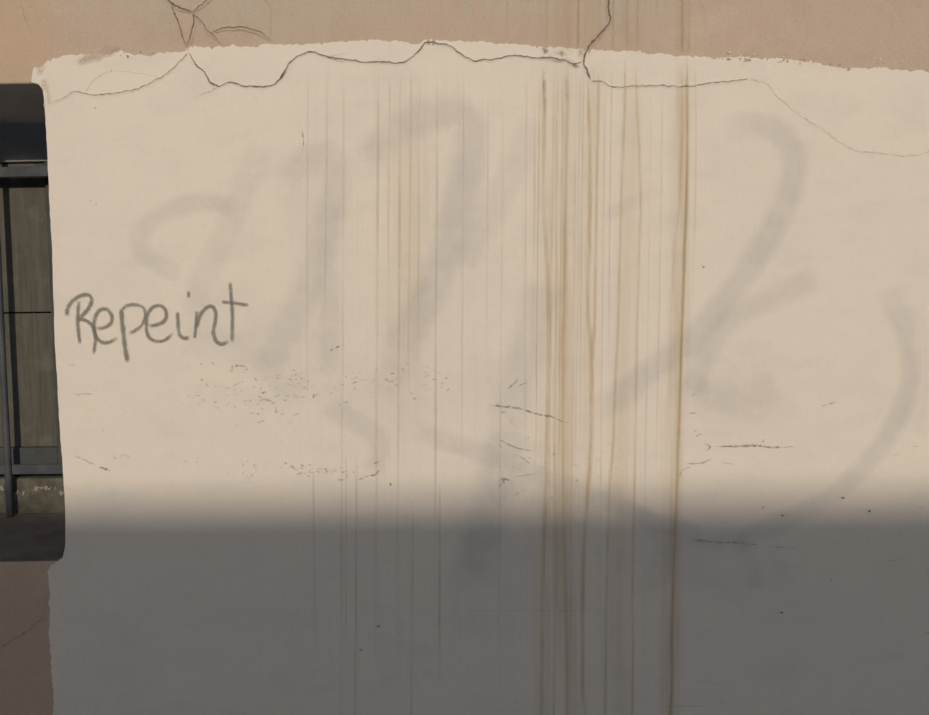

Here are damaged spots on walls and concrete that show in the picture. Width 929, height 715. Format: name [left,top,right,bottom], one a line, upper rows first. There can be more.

crack [43,0,748,106]